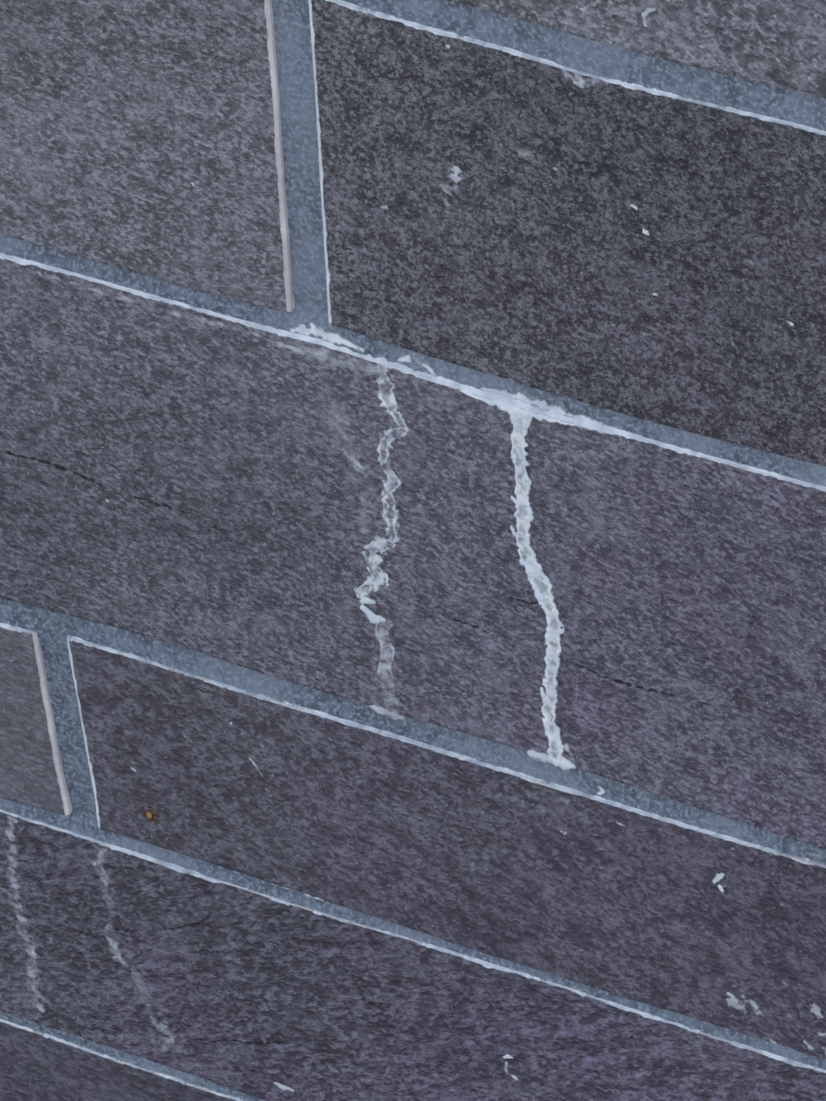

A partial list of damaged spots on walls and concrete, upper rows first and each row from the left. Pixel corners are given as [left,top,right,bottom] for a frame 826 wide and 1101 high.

crack [443,615,490,634]